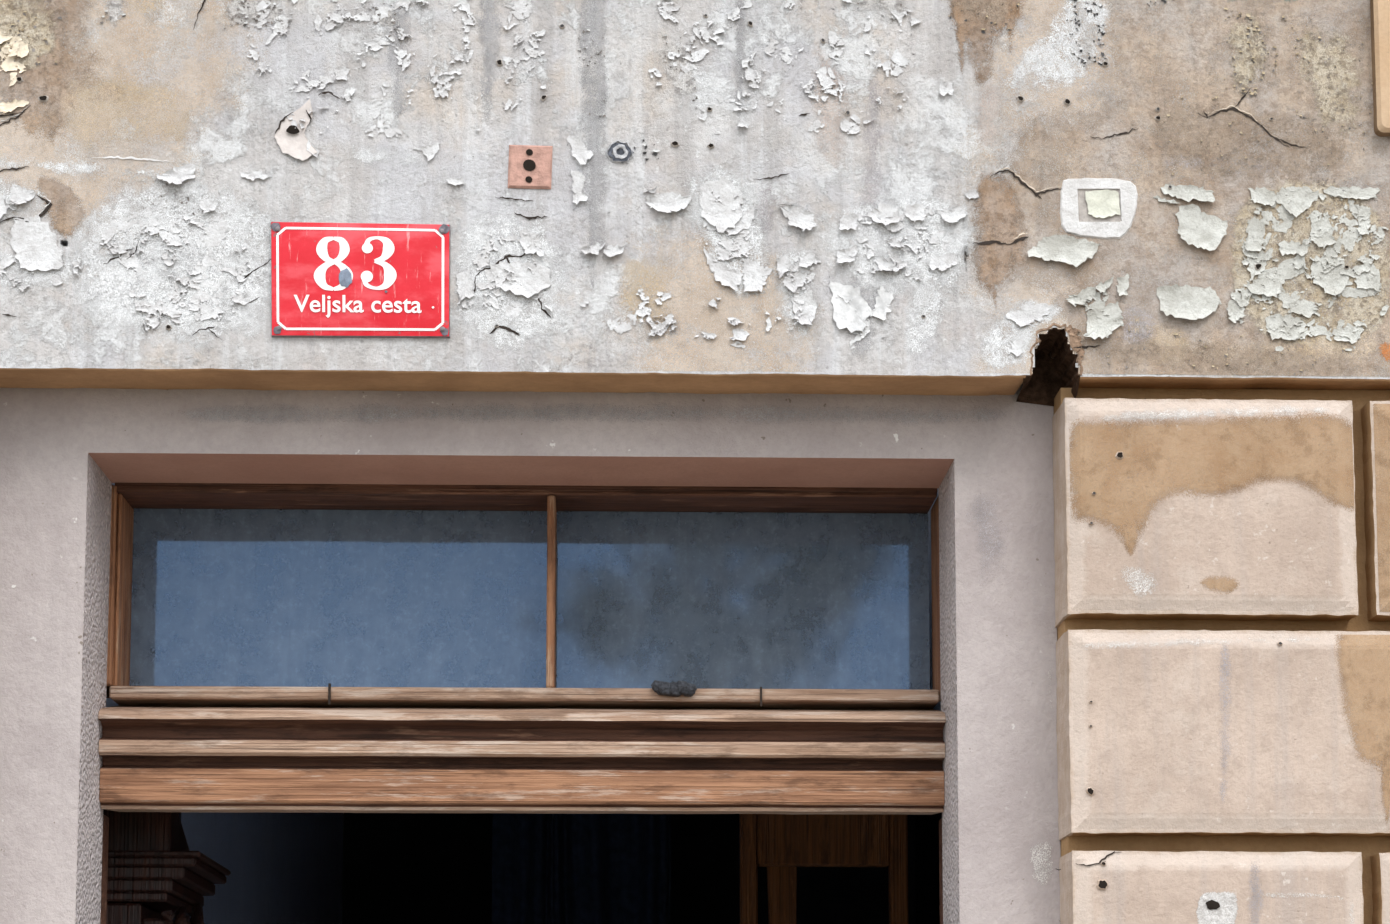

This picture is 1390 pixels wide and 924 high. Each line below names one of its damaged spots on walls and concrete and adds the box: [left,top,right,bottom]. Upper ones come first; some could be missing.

flaking render [0,0,65,114]
flaking render [224,0,298,76]
peeling [274,0,430,161]
peeling [428,0,476,103]
peeling [503,0,546,110]
water stain [941,0,1112,149]
crack [1198,88,1307,148]
peeling [0,164,277,351]
peeling [607,289,677,336]
flaking render [642,0,1390,406]
water stain [1069,405,1355,599]
water stain [1286,635,1390,823]